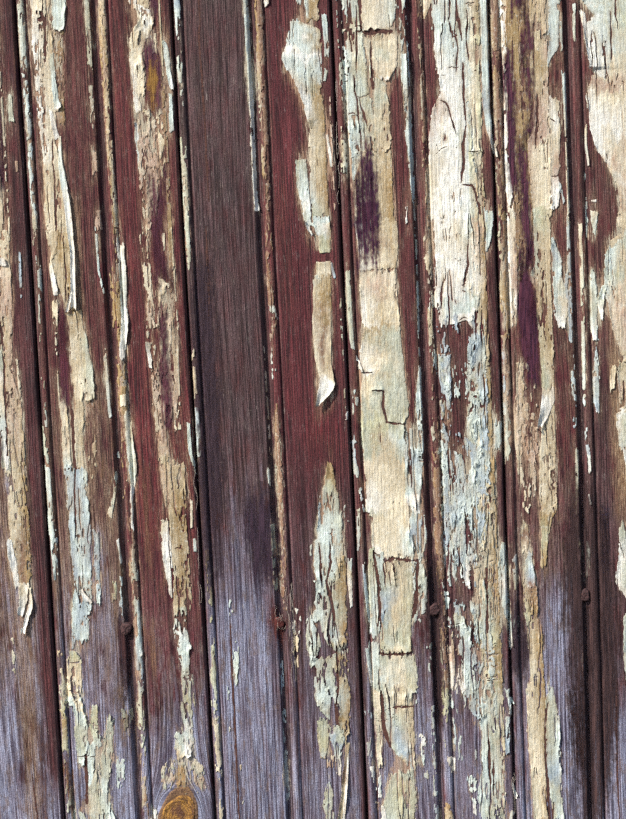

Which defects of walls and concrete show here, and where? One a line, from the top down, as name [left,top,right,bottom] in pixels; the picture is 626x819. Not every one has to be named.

peeling [243,0,271,211]
peeling [0,71,33,674]
peeling [128,0,213,795]
crack [361,372,405,426]
peeling [263,0,626,819]
corrosion [117,610,134,699]
peeling [210,638,231,780]
peeling [227,641,239,700]
peeling [141,776,157,819]